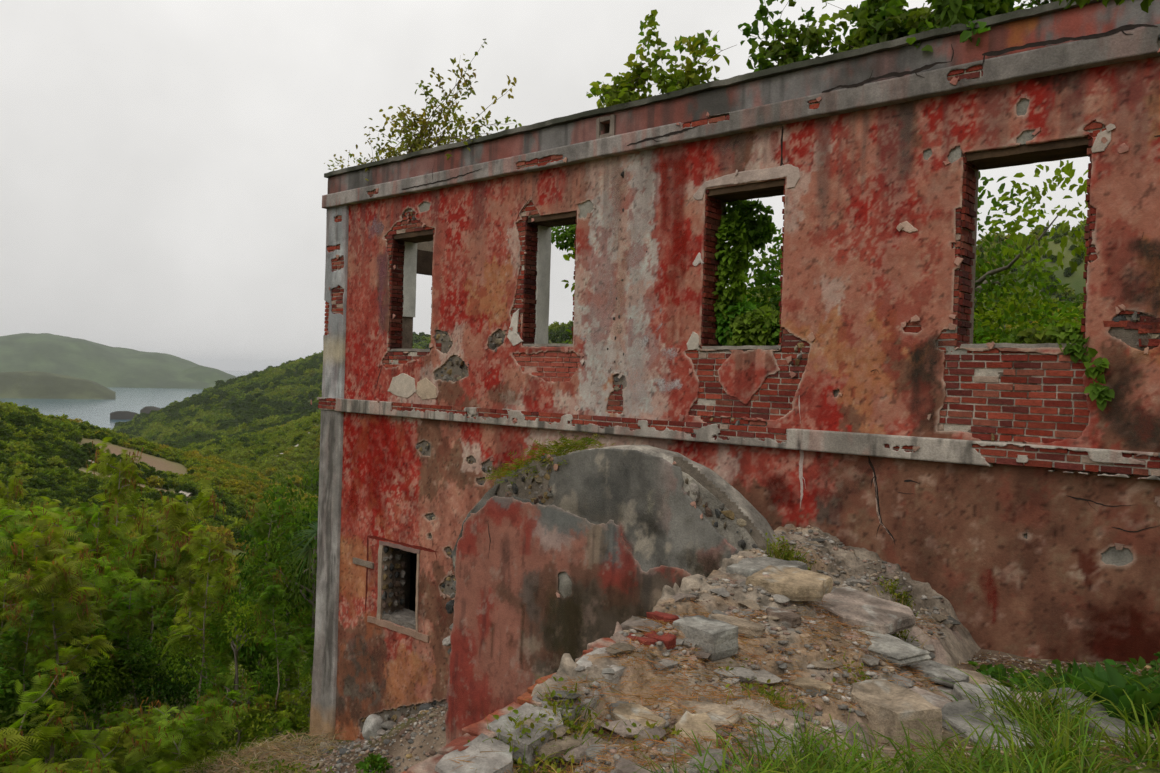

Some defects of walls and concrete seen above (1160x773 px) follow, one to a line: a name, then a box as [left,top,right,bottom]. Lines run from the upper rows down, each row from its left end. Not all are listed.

crack [822,44,954,93]
crack [981,24,1158,72]
flaking render [923,146,962,165]
flaking render [1016,127,1041,144]
spalling [1083,119,1129,154]
spalling [378,202,469,382]
spalling [901,315,922,333]
spalling [927,207,1160,477]
spalling [376,297,815,444]
crack [868,456,919,543]
leakage [689,555,718,578]
flaking render [1101,543,1133,566]